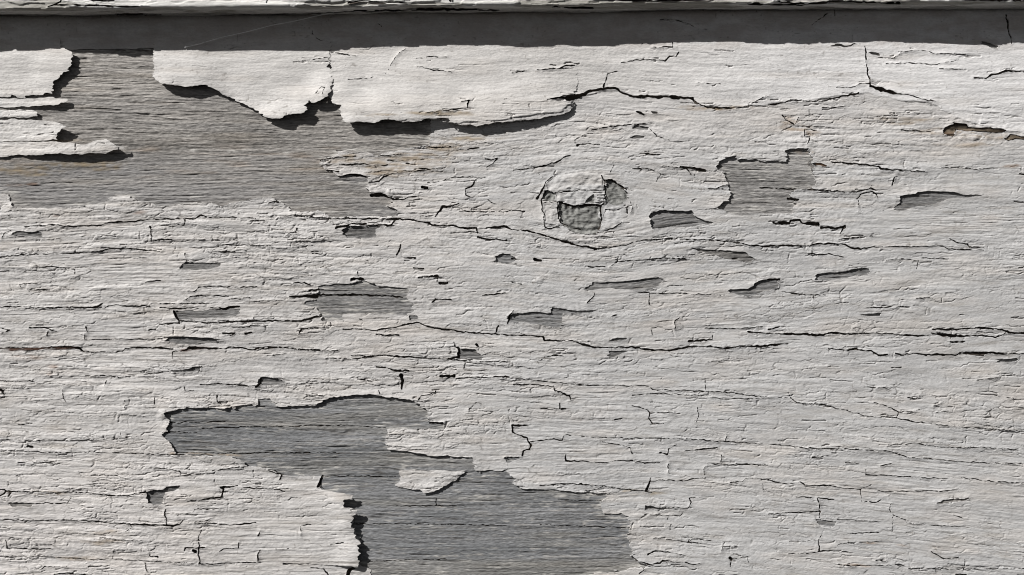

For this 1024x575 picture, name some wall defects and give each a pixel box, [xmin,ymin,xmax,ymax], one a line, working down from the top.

peeling [0,33,578,239]
crack [214,42,1024,269]
peeling [943,122,1024,141]
peeling [649,210,713,229]
peeling [716,148,827,215]
peeling [894,191,982,211]
peeling [300,280,418,321]
peeling [510,308,597,329]
peeling [585,277,664,293]
crack [0,215,1024,575]
peeling [162,377,648,575]